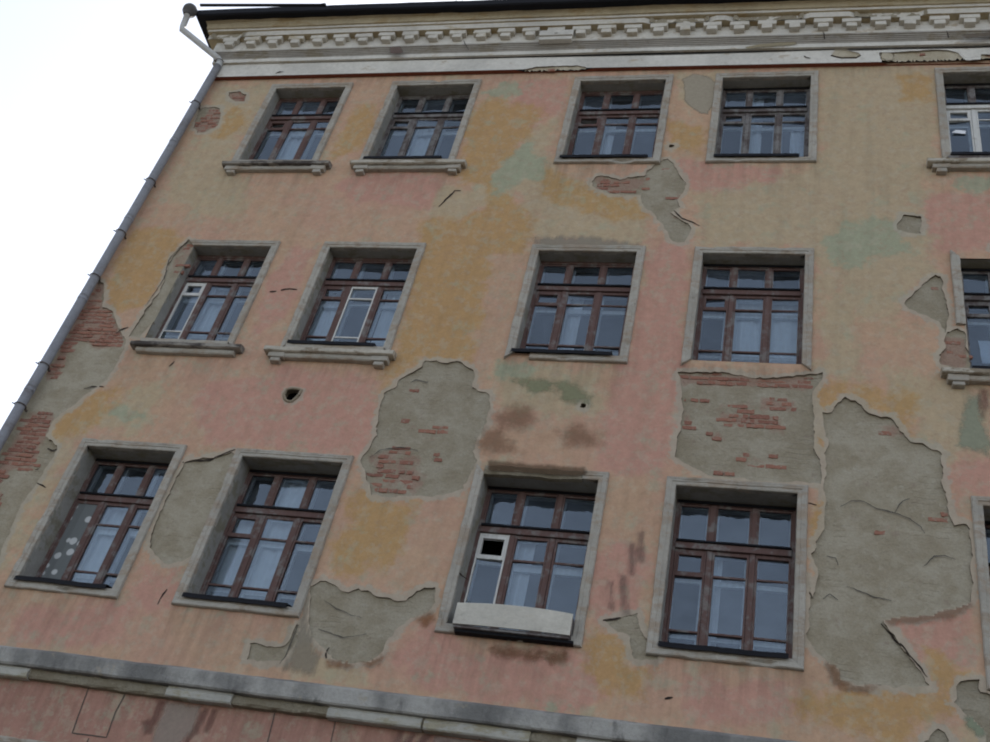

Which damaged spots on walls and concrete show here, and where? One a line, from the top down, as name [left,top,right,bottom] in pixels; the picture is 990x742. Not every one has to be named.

flaking render [194,107,221,133]
flaking render [229,91,247,101]
flaking render [592,159,691,243]
flaking render [904,275,973,368]
flaking render [0,240,196,554]
flaking render [361,360,491,497]
flaking render [150,452,234,564]
flaking render [675,371,973,688]
flaking render [247,581,436,664]
flaking render [604,613,658,660]
flaking render [954,679,990,742]